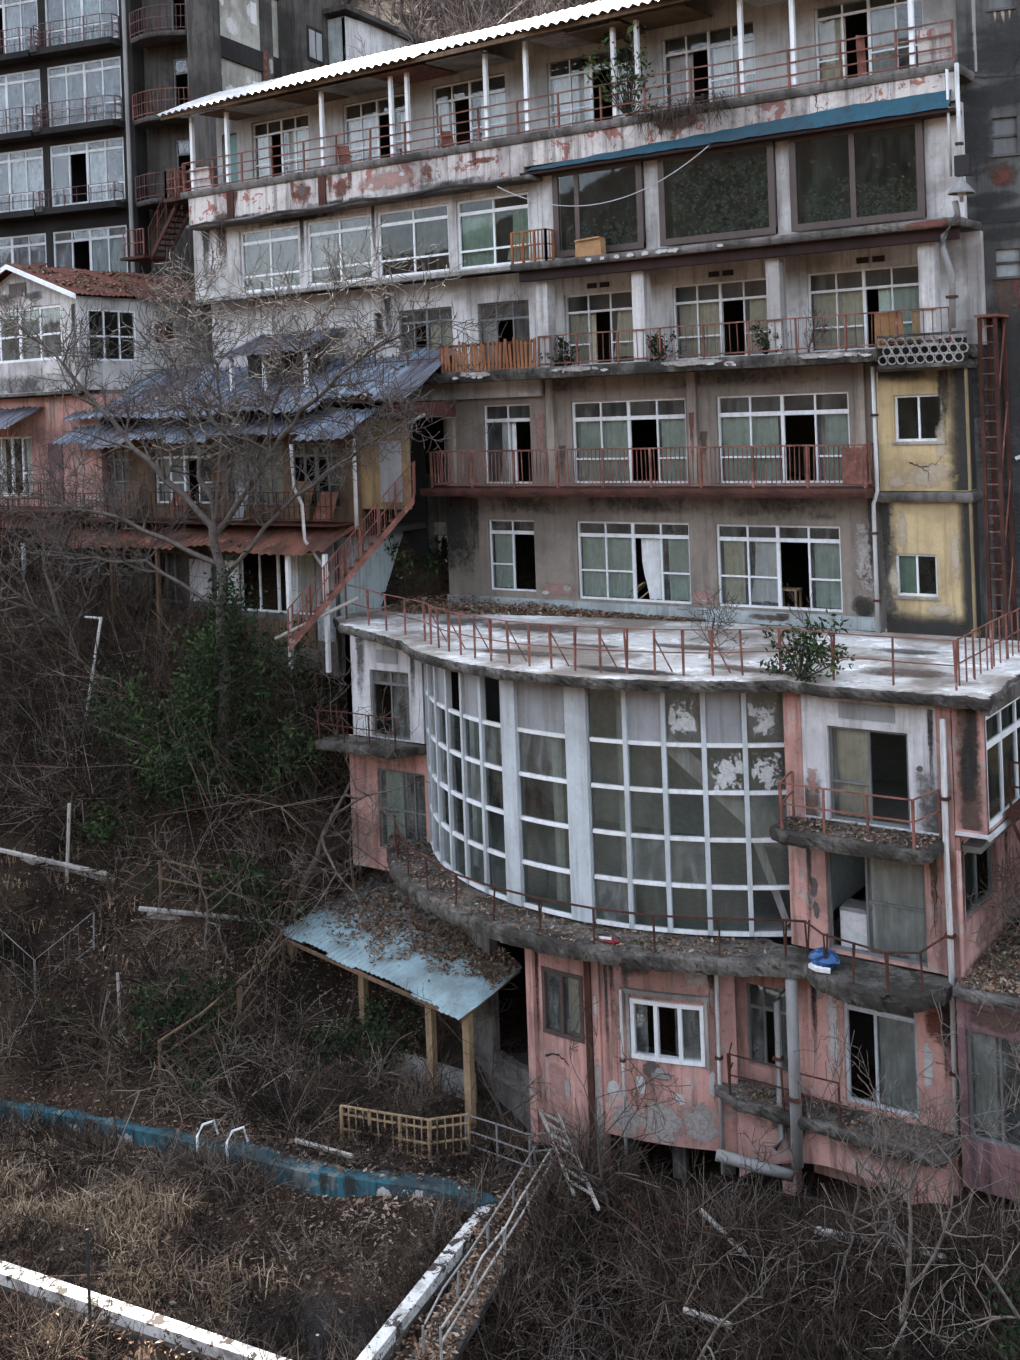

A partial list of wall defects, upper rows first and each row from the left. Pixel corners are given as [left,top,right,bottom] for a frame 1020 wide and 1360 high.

damp [959,10,1020,176]
peeling [360,171,413,191]
damp [967,191,1020,241]
peeling [594,973,720,1172]